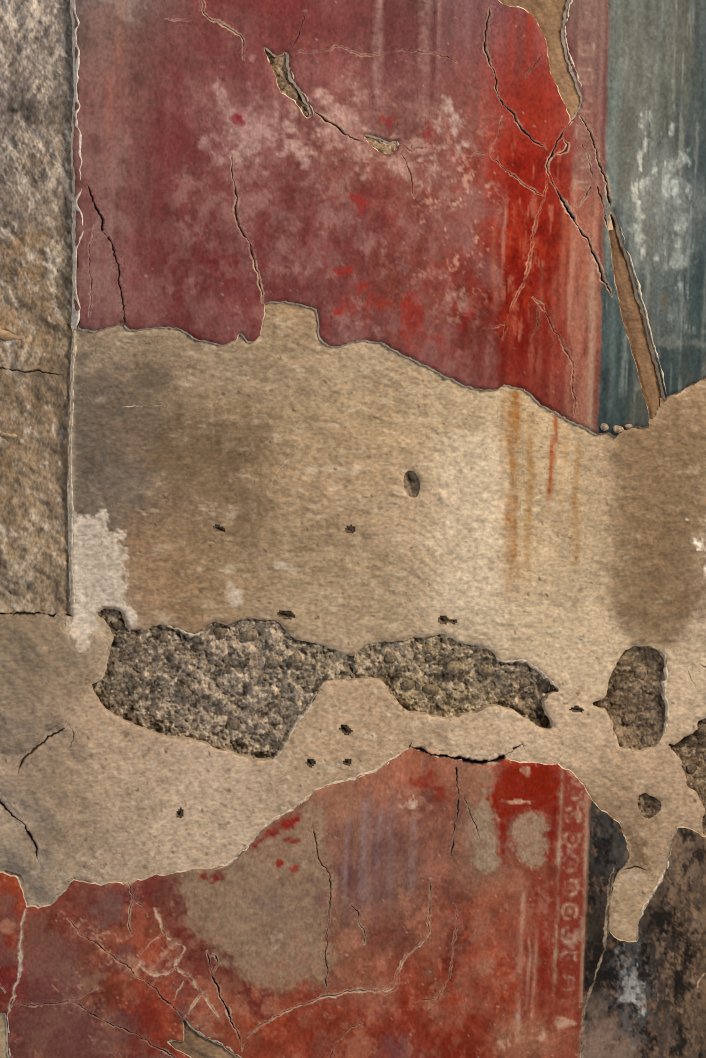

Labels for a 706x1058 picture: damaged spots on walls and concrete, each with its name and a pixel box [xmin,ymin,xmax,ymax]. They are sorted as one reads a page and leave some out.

crack [164,0,249,61]
crack [82,179,130,326]
crack [225,155,270,305]
spalling [67,0,559,759]
crack [464,3,616,416]
spalling [609,214,667,419]
corrosion [497,386,585,607]
water stain [594,383,706,655]
crack [0,739,525,1058]
peeling [161,750,405,1021]
peeling [463,762,563,877]
spalling [593,646,706,835]